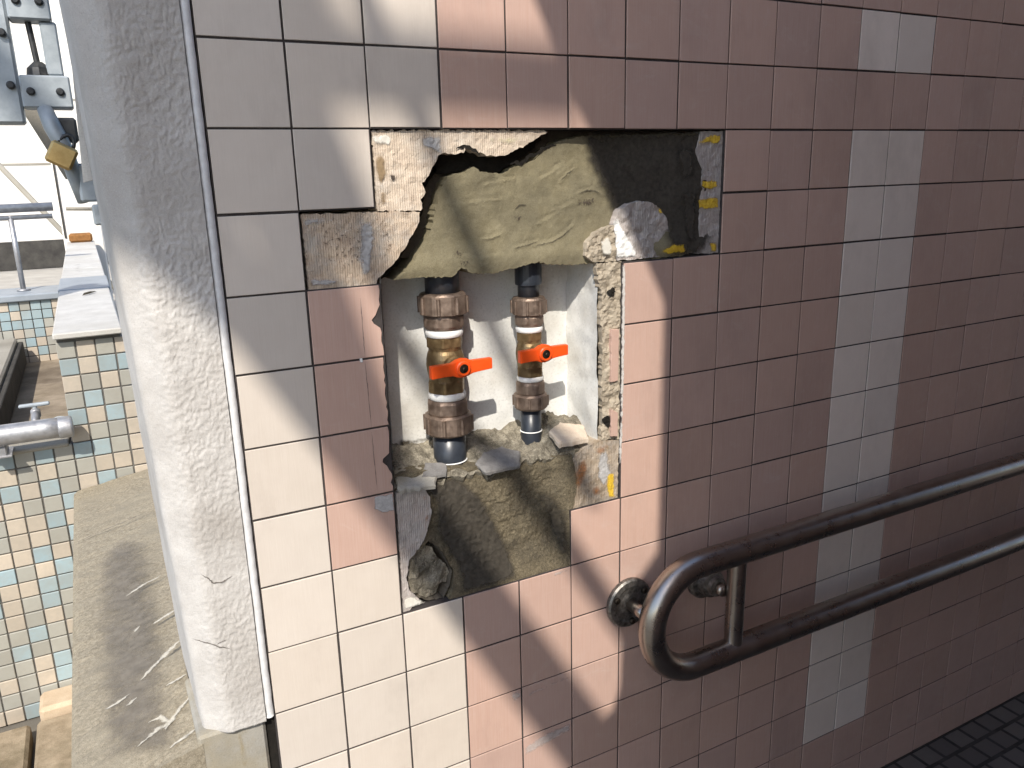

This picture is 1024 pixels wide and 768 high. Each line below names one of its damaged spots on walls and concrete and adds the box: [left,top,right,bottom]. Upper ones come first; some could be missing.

spalling [299,129,547,290]
spalling [685,131,723,254]
spalling [573,201,669,509]
spalling [394,490,452,612]